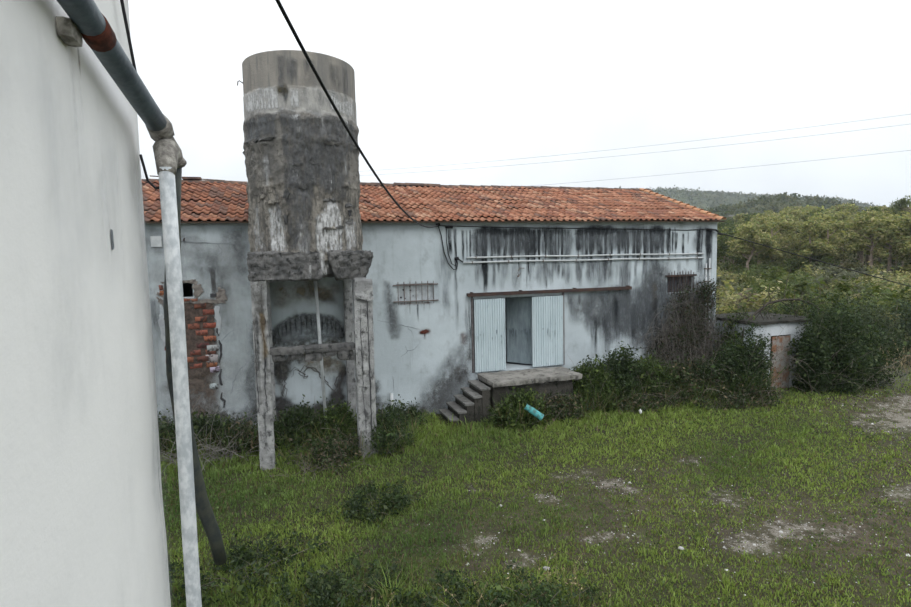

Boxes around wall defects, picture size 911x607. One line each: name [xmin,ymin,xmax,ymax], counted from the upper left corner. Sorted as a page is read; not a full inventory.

peeling [321,95,353,146]
peeling [255,155,356,253]
flaking render [156,282,166,350]
damp [387,285,398,336]
damp [448,225,713,374]
flaking render [182,279,228,422]
damp [402,351,470,413]